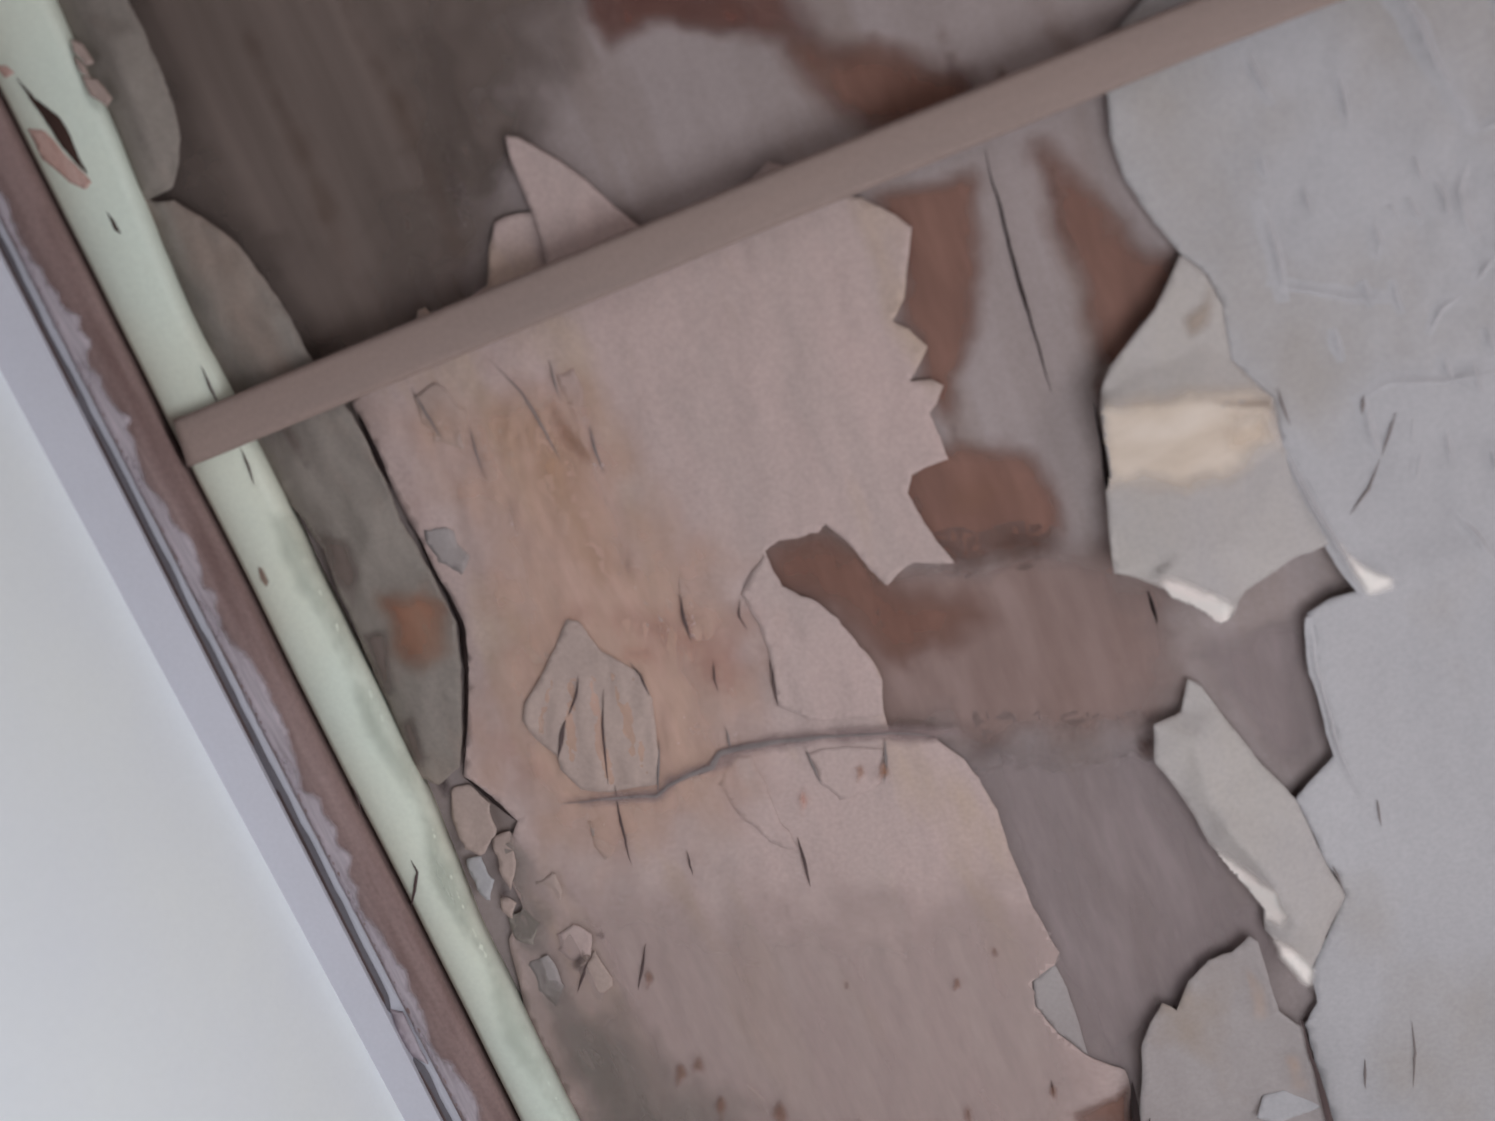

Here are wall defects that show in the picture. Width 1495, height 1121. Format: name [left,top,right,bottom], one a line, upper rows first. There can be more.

peeling [0,66,92,189]
peeling [57,0,314,394]
peeling [473,136,639,295]
crack [984,148,1051,390]
peeling [0,195,477,1121]
peeling [258,196,1131,1121]
crack [558,594,957,864]
peeling [1101,0,1495,1121]